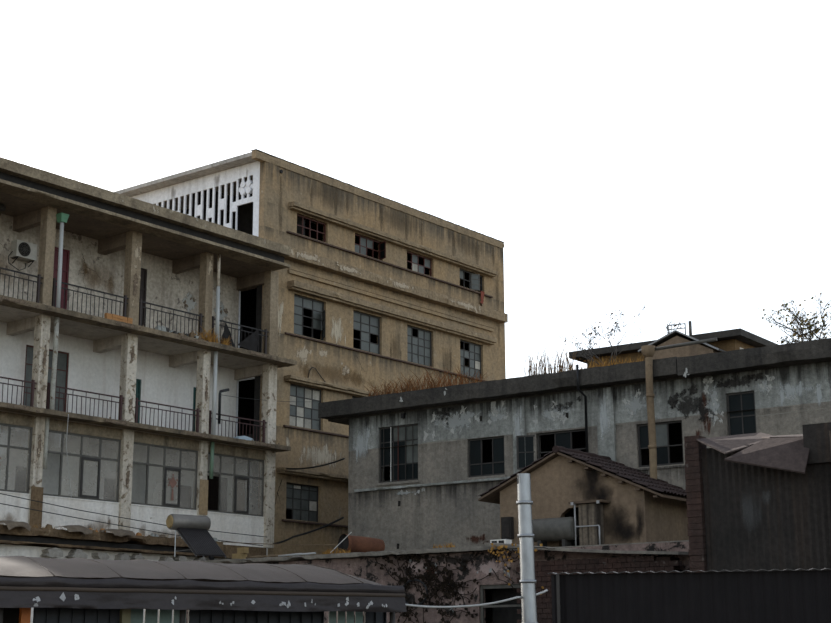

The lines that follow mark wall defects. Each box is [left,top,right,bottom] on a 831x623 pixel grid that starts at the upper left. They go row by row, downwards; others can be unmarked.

water stain [717,373,763,388]
peeling [424,401,509,442]
peeling [532,401,571,429]
water stain [667,383,715,422]
spalling [702,377,724,428]